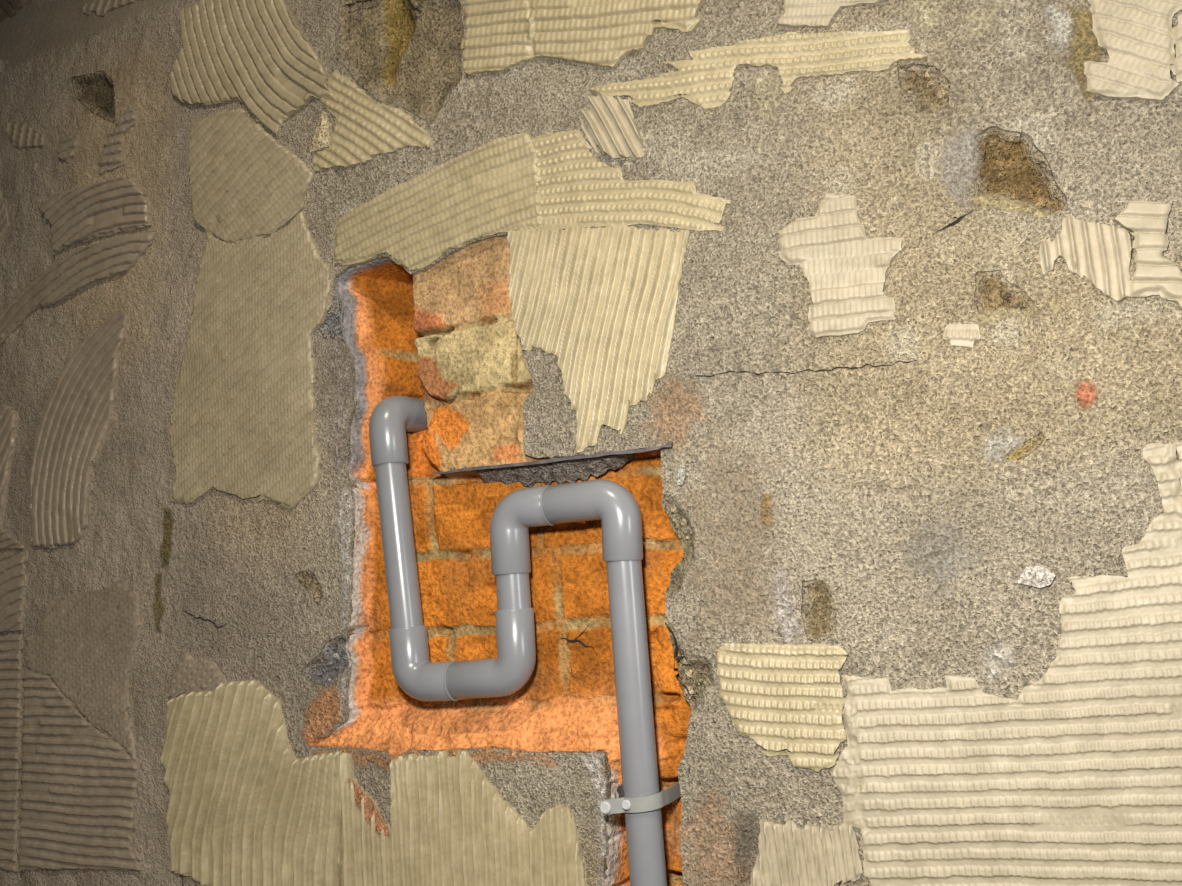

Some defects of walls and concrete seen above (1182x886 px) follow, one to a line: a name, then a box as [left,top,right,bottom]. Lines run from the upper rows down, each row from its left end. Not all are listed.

spalling [336,0,464,124]
spalling [319,264,359,343]
crack [691,360,917,378]
spalling [662,465,695,600]
spalling [302,635,352,688]
spalling [666,617,714,718]